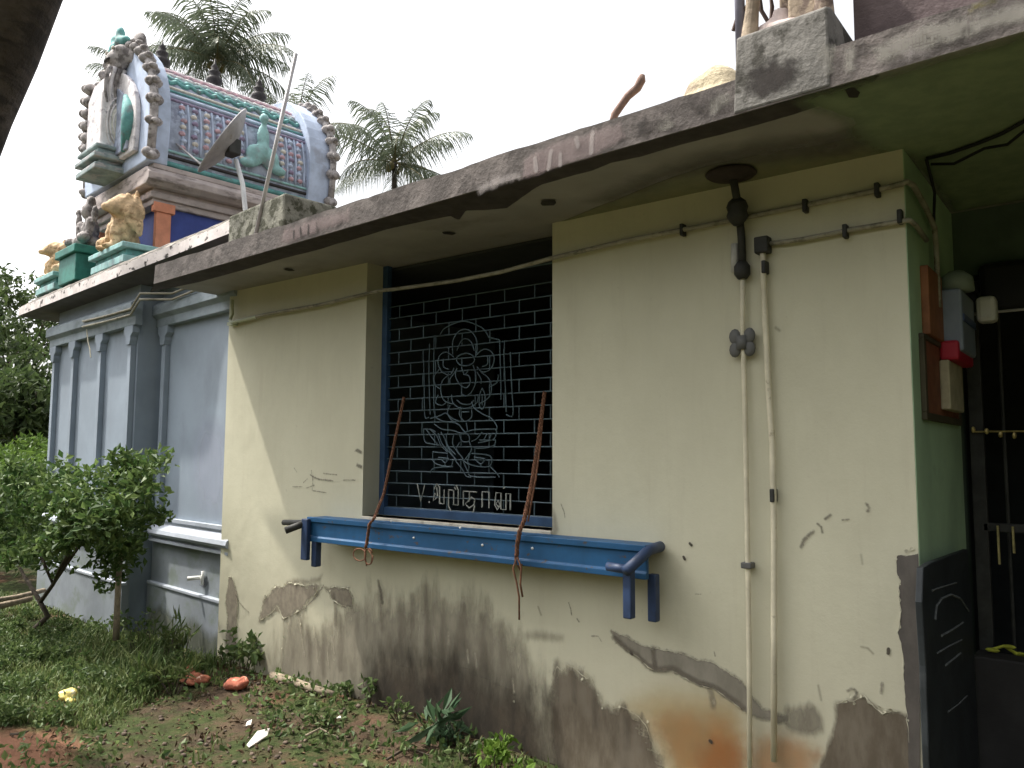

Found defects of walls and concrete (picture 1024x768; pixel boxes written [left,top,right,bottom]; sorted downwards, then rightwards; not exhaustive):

peeling [225,576,238,653]
peeling [259,582,353,623]
damp [281,596,663,768]
flaking render [887,547,920,768]